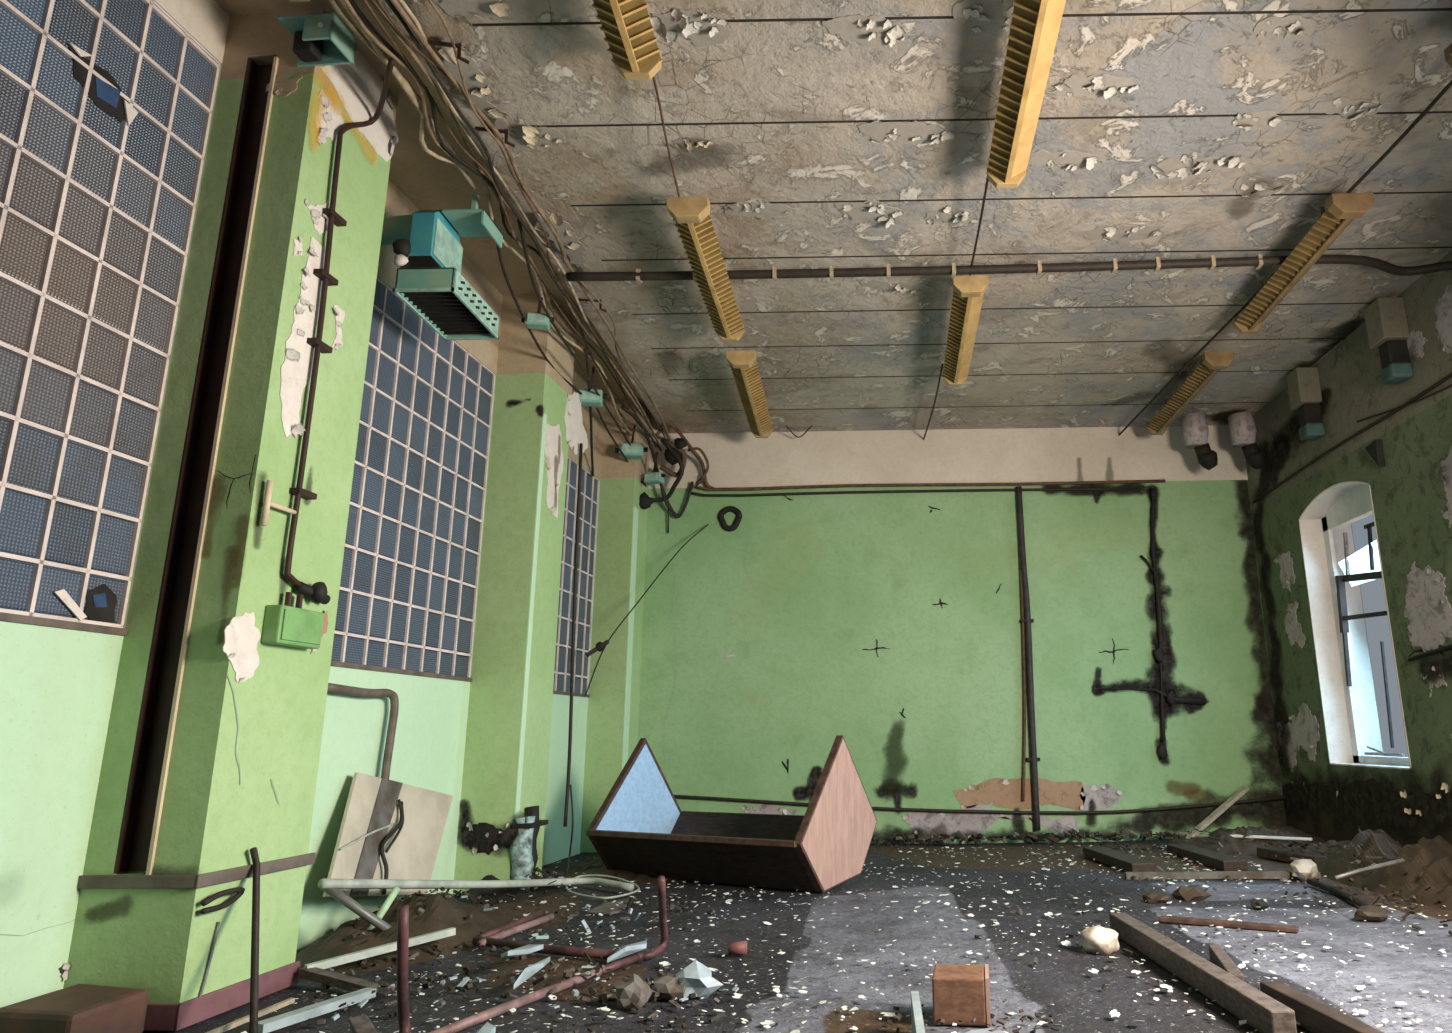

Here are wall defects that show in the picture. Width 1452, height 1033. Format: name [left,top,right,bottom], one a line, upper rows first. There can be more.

peeling [650,8,731,47]
peeling [822,14,908,47]
peeling [314,50,399,162]
peeling [435,38,565,149]
peeling [1045,74,1140,99]
peeling [1151,154,1286,199]
peeling [279,198,345,438]
damp [1319,389,1330,415]
damp [873,412,1452,840]
peeling [1273,551,1306,648]
peeling [1404,561,1452,698]
flaking render [903,778,1123,840]